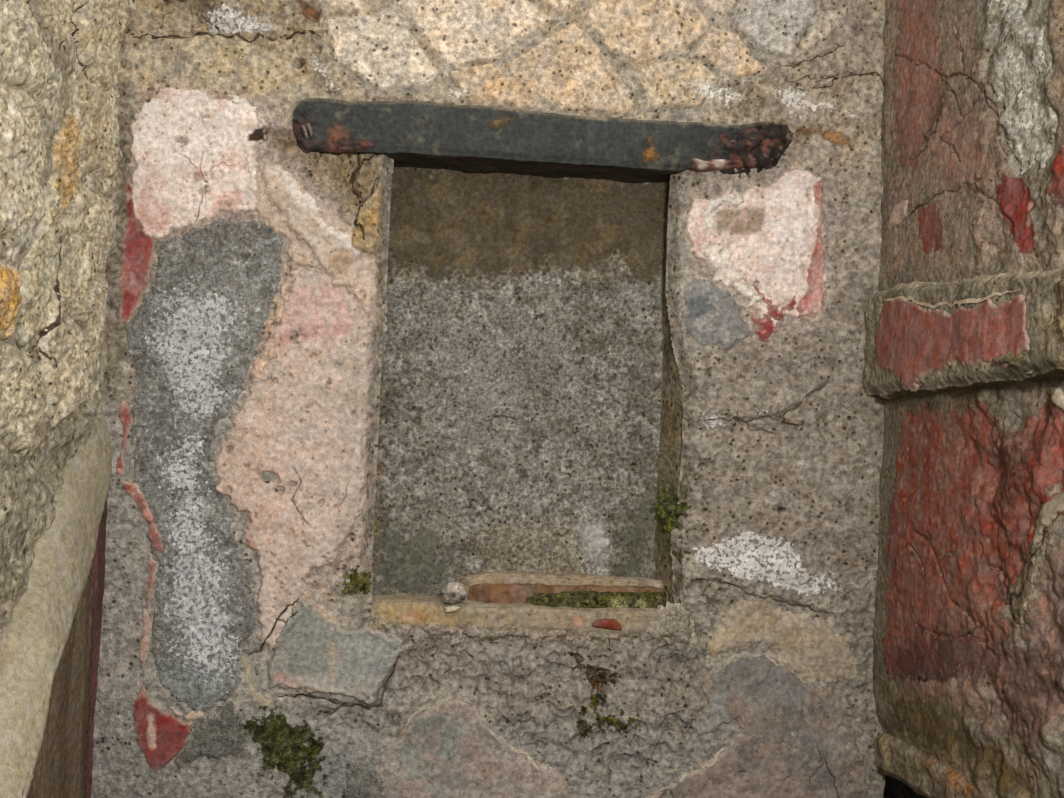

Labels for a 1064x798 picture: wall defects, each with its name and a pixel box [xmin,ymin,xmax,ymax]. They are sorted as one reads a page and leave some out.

crack [39,4,88,80]
crack [780,26,1008,168]
crack [907,178,1006,217]
crack [16,235,62,367]
peeling [875,289,1030,391]
crack [700,382,827,434]
leakage [690,529,838,598]
peeling [882,386,1064,767]